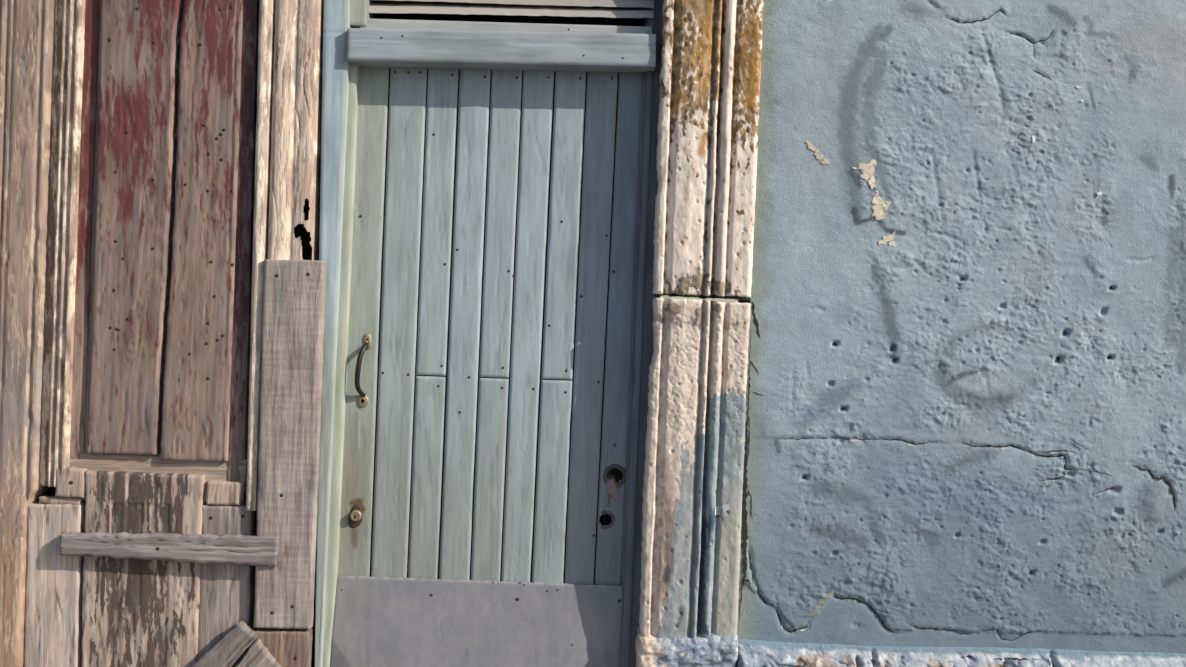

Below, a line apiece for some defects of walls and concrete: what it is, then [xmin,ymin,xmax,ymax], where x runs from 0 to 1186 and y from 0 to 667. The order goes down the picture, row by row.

crack [934,6,1056,80]
peeling [805,140,830,164]
peeling [853,159,891,220]
water stain [852,208,906,235]
peeling [878,232,897,247]
crack [663,294,1176,633]